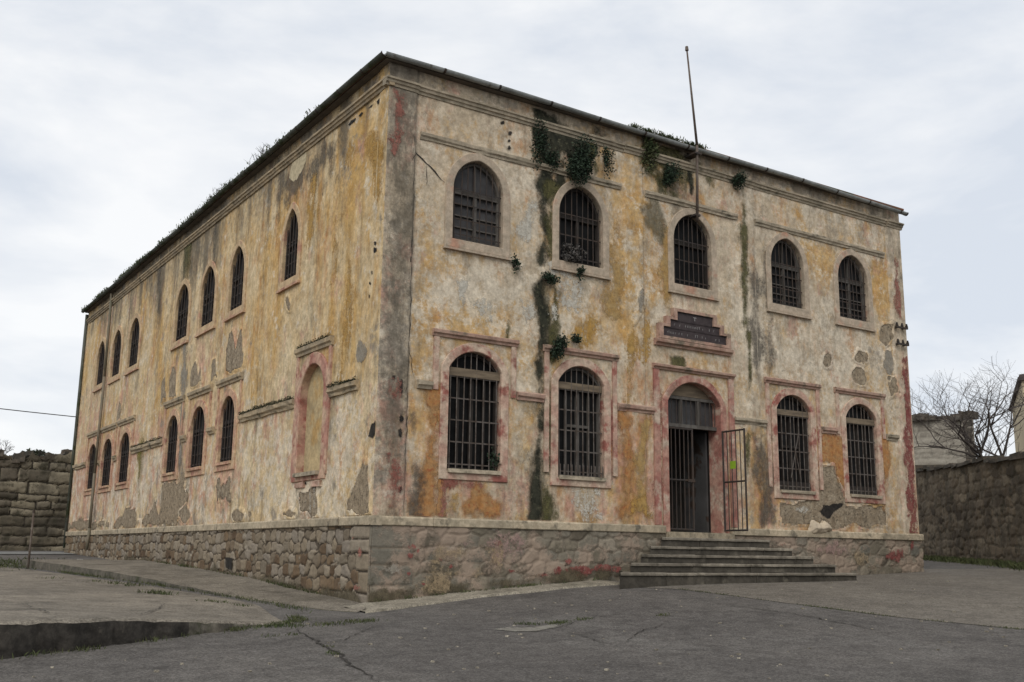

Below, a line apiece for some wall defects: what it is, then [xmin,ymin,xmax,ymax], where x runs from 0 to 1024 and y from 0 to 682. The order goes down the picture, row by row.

leakage [532,135,625,380]
crack [403,138,443,507]
leakage [738,205,774,388]
spalling [160,363,177,407]
spalling [190,326,247,390]
spalling [849,320,902,401]
spalling [68,472,193,531]
spalling [215,473,254,522]
spalling [280,479,320,519]
spalling [344,454,372,516]
leakage [528,403,558,520]
spalling [776,462,888,531]